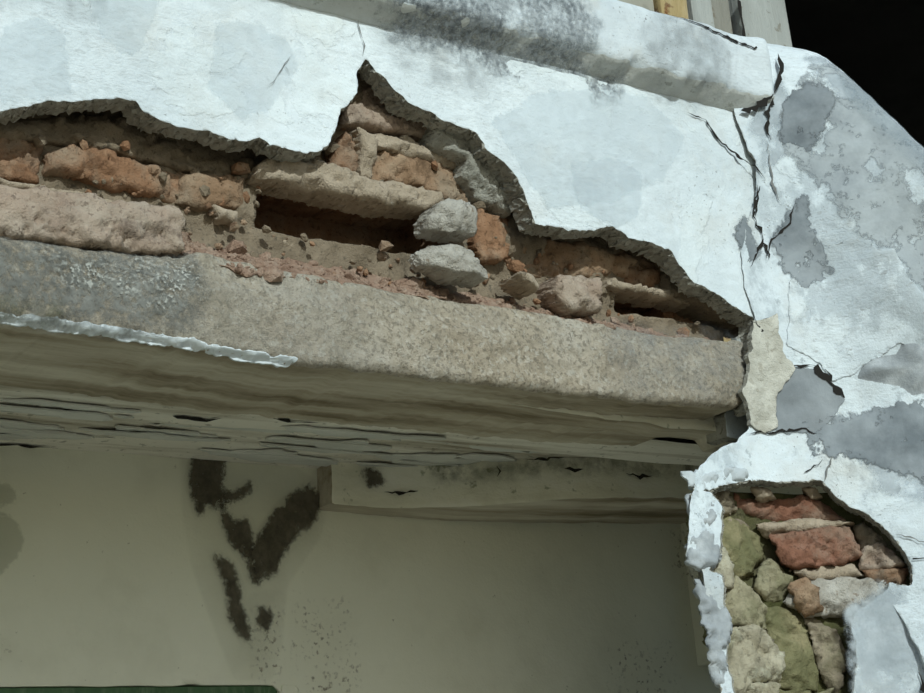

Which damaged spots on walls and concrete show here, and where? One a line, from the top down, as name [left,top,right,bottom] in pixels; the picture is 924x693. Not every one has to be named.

crack [672,0,757,49]
crack [690,54,795,266]
flaking render [0,57,924,497]
water stain [221,481,260,585]
flaking render [713,486,924,693]